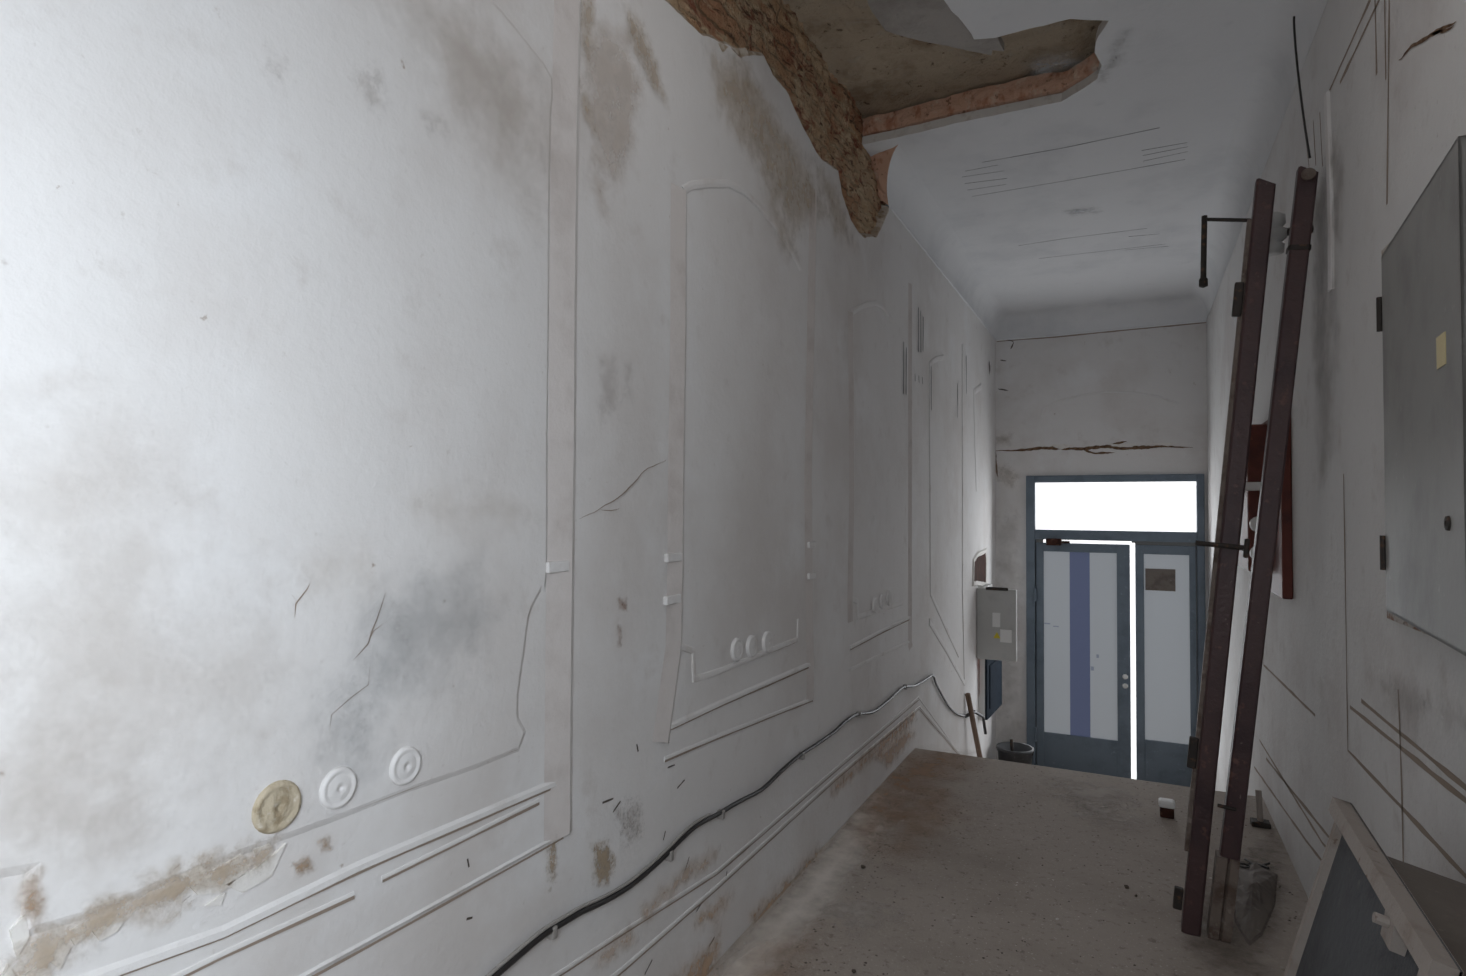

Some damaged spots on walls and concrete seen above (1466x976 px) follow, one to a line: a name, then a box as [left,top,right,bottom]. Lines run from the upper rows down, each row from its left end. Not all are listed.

spalling [665,0,889,238]
crack [580,460,666,519]
crack [996,441,1193,476]
peeling [1,843,286,976]